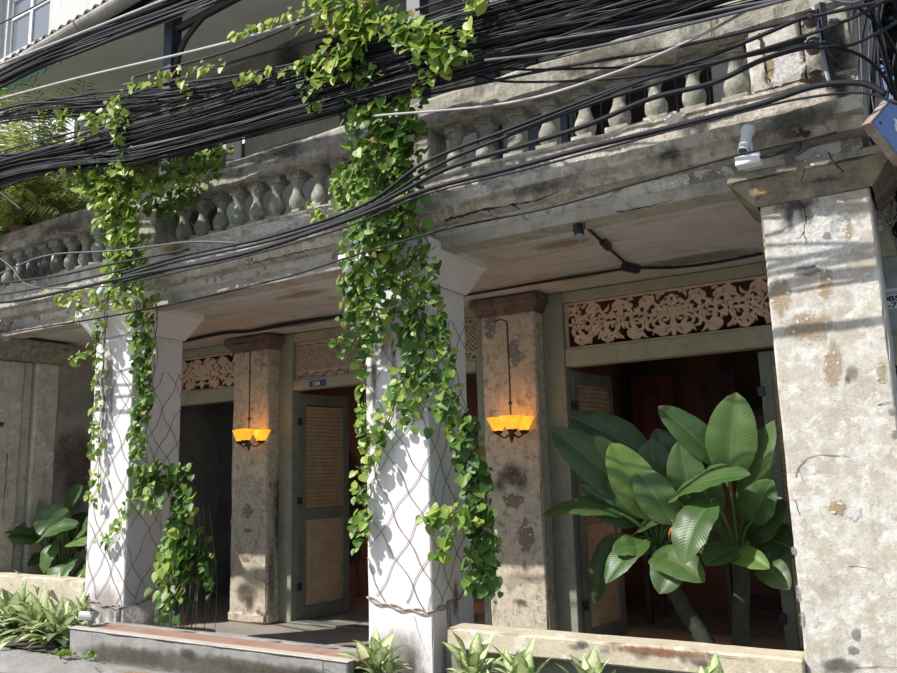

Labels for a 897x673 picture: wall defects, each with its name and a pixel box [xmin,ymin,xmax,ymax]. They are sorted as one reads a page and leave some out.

crack [827,152,852,185]
crack [445,191,558,222]
leakage [779,194,813,210]
crack [799,168,808,241]
peeling [784,200,860,297]
spalling [769,272,841,386]
crack [1,453,9,519]
leakage [497,466,524,485]
crack [794,455,852,515]
leakage [238,585,255,601]
leakage [825,658,857,670]